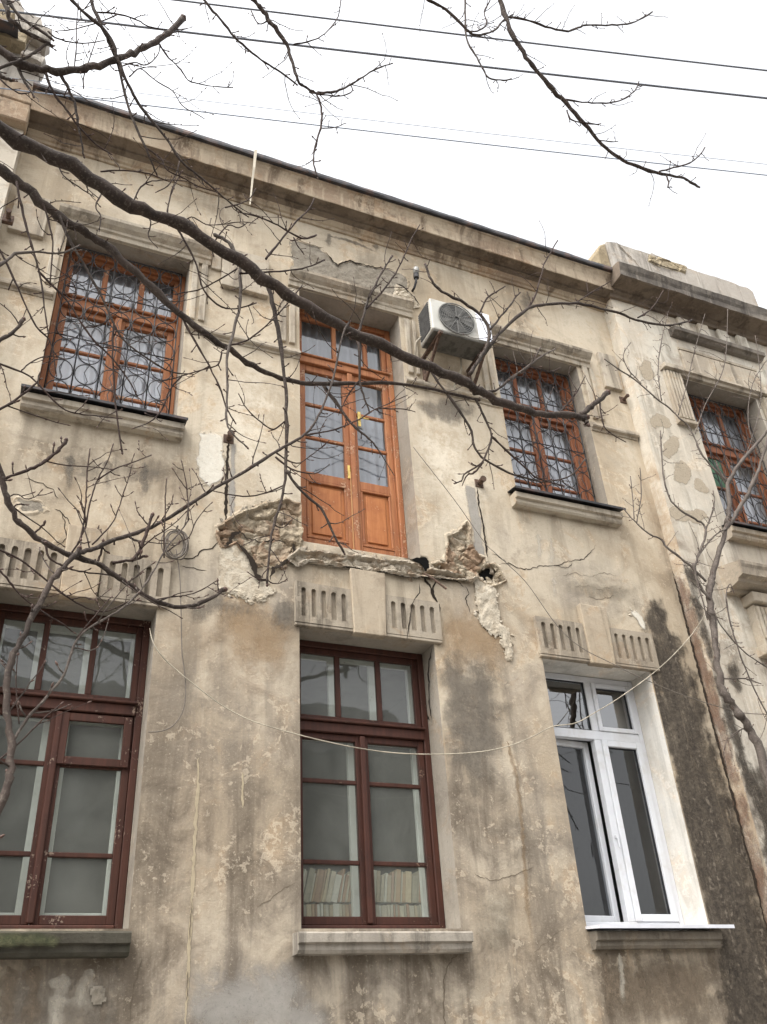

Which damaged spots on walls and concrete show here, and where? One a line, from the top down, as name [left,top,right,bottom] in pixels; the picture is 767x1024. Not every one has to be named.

flaking render [287,239,420,308]
flaking render [195,431,305,605]
flaking render [429,520,507,597]
crack [477,489,624,600]
water stain [603,568,767,1024]
crack [184,758,200,1024]